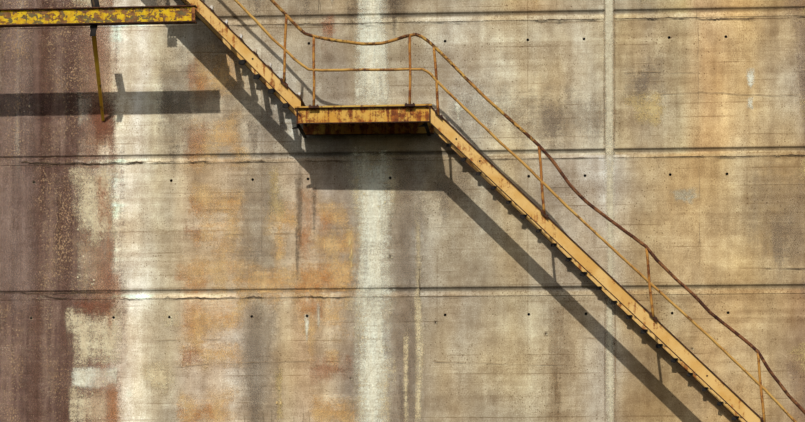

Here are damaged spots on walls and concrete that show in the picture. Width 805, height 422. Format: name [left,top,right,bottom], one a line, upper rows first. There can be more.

crack [234,0,594,26]
crack [601,1,757,20]
rust [89,99,114,139]
crack [24,159,345,167]
crack [648,152,805,160]
rust [245,233,355,300]
crack [0,292,264,300]